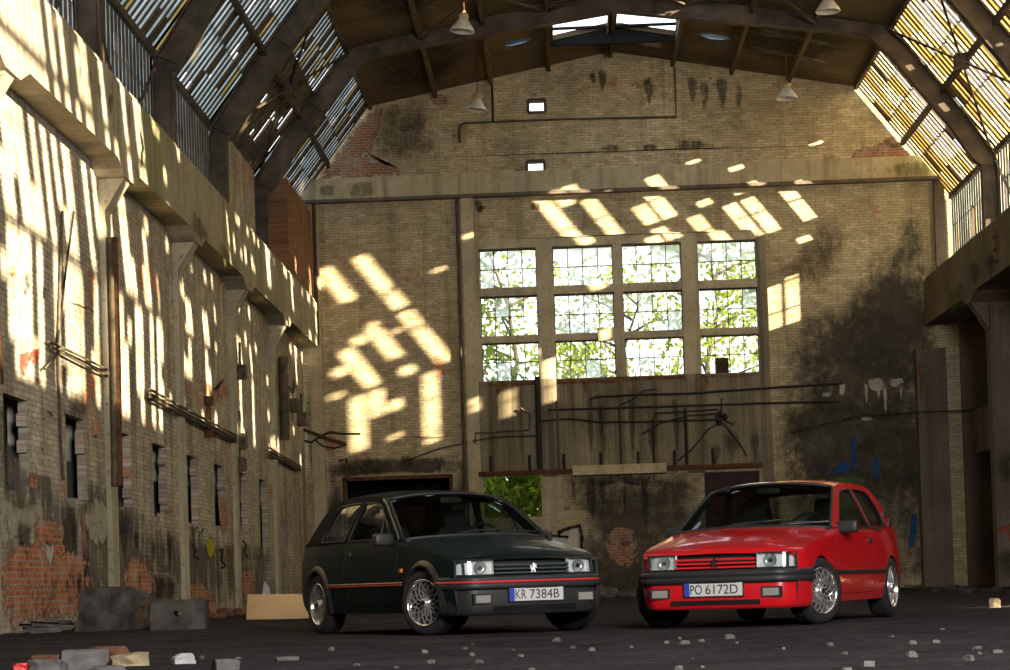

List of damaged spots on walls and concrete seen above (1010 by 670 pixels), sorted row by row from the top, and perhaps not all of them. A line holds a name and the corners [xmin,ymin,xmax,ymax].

water stain [688,80,726,104]
flaking render [320,106,400,179]
flaking render [851,136,912,158]
peeling [865,378,904,412]
flaking render [83,497,108,545]
flaking render [0,497,94,629]
flaking render [602,527,641,568]
flaking render [124,554,161,628]